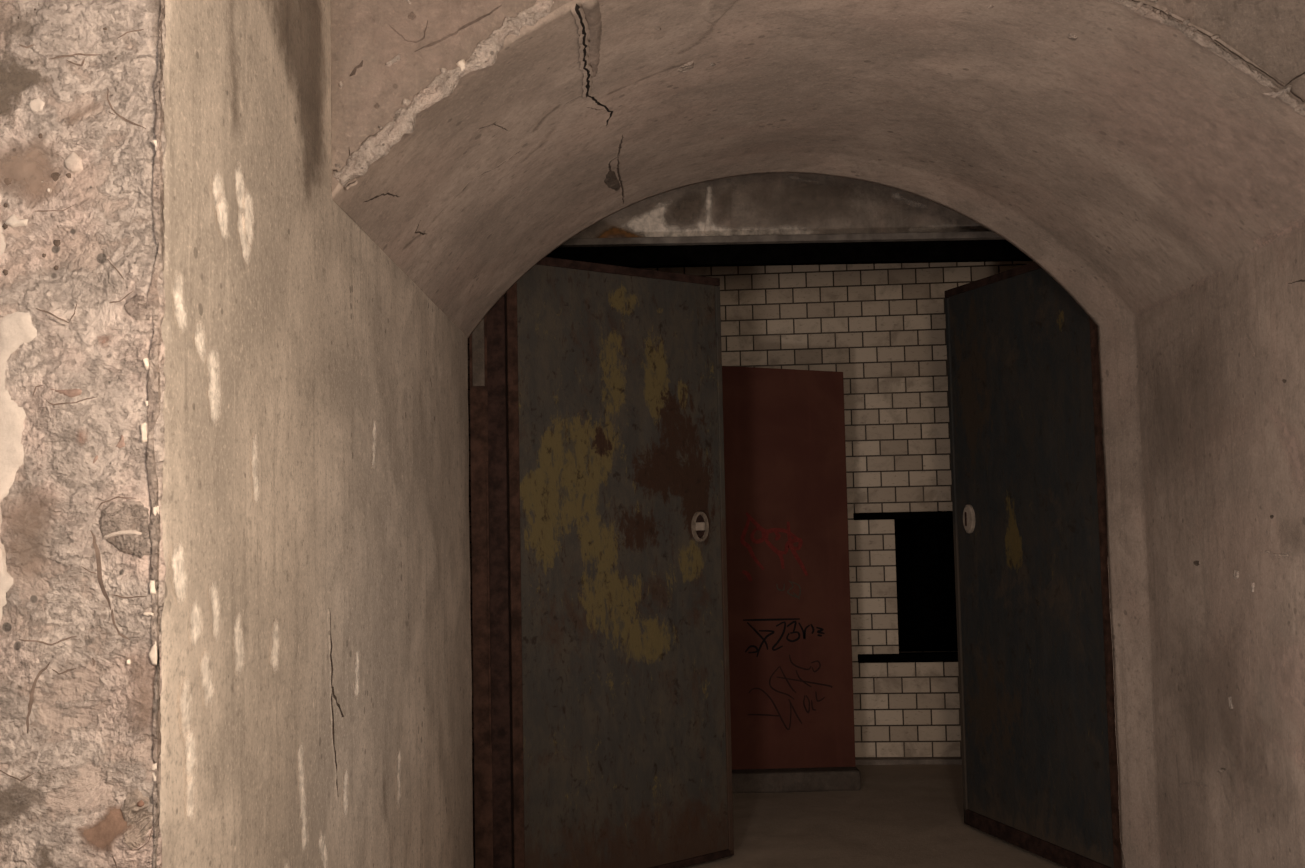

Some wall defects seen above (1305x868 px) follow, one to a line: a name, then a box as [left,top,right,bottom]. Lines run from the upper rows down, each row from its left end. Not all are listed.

flaking render [29,98,45,112]
spalling [333,0,554,187]
crack [564,3,625,205]
spalling [1109,0,1305,117]
flaking render [0,181,28,276]
flaking render [41,151,83,193]
flaking render [0,312,97,624]